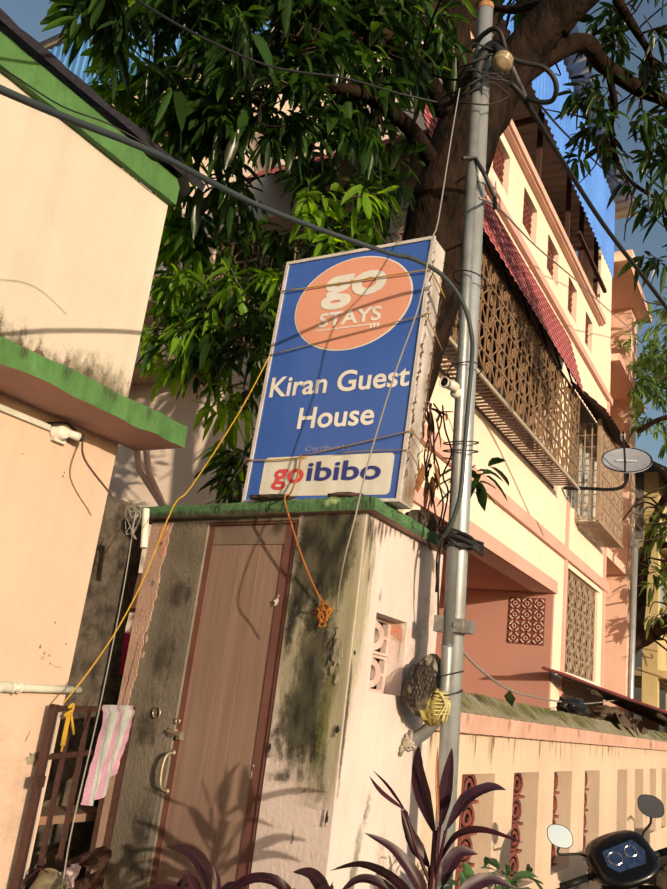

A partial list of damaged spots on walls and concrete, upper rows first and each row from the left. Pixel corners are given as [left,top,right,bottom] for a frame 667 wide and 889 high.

leakage [269,513,402,793]